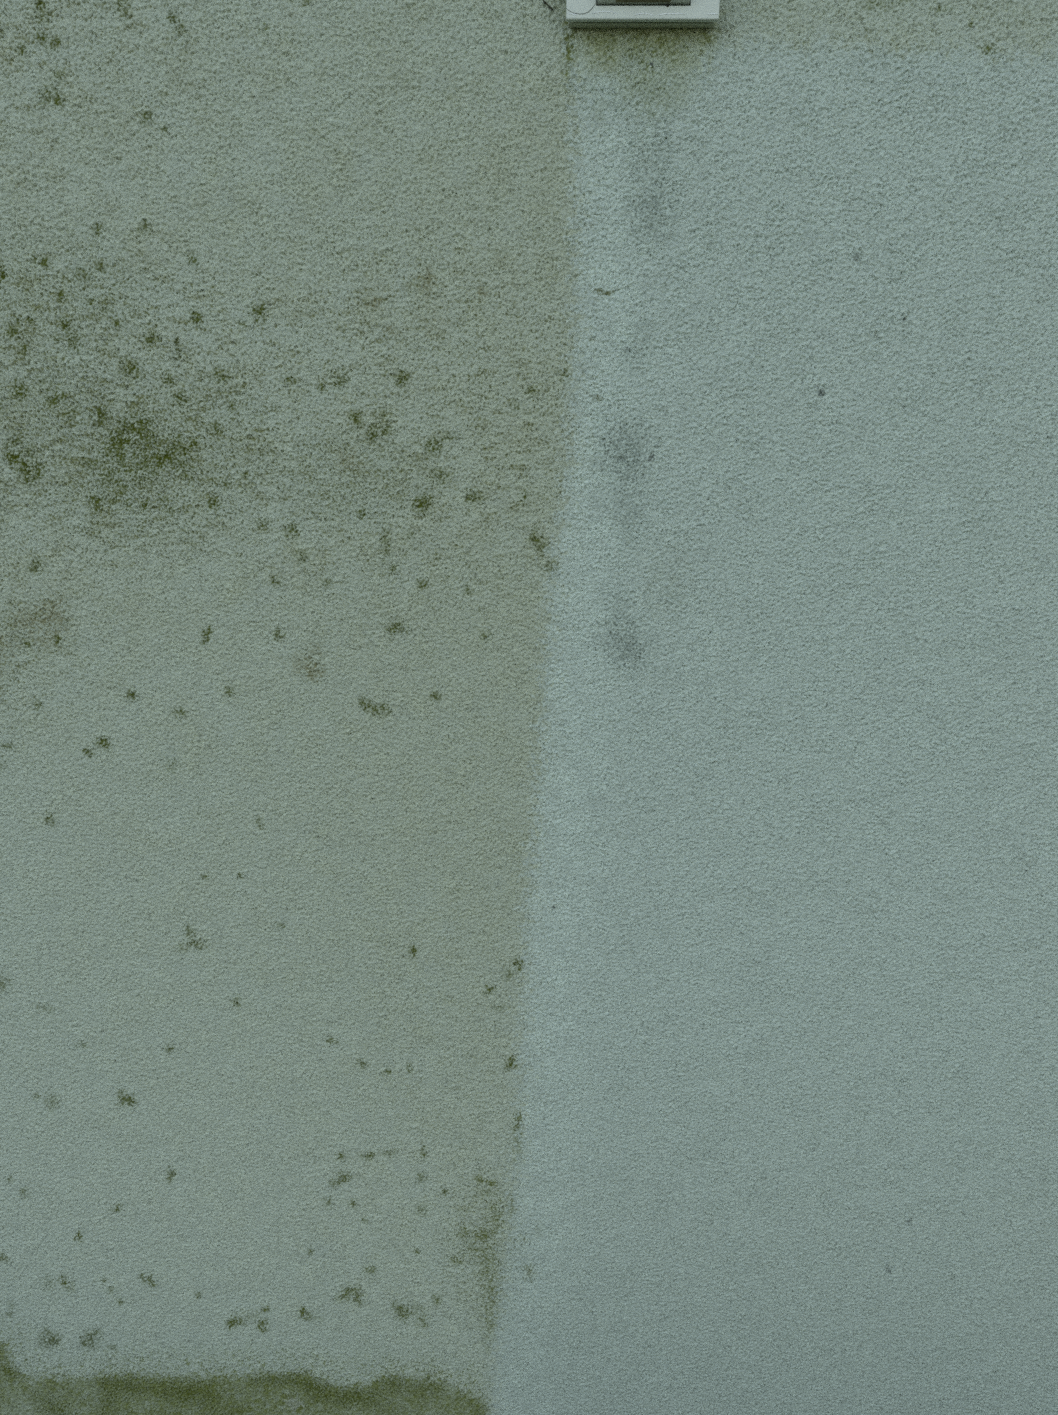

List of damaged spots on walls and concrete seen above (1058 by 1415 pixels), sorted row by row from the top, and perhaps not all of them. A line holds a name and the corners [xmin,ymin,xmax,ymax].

water stain [361,259,440,339]
water stain [0,590,83,708]
water stain [283,639,330,688]
water stain [445,1109,548,1357]